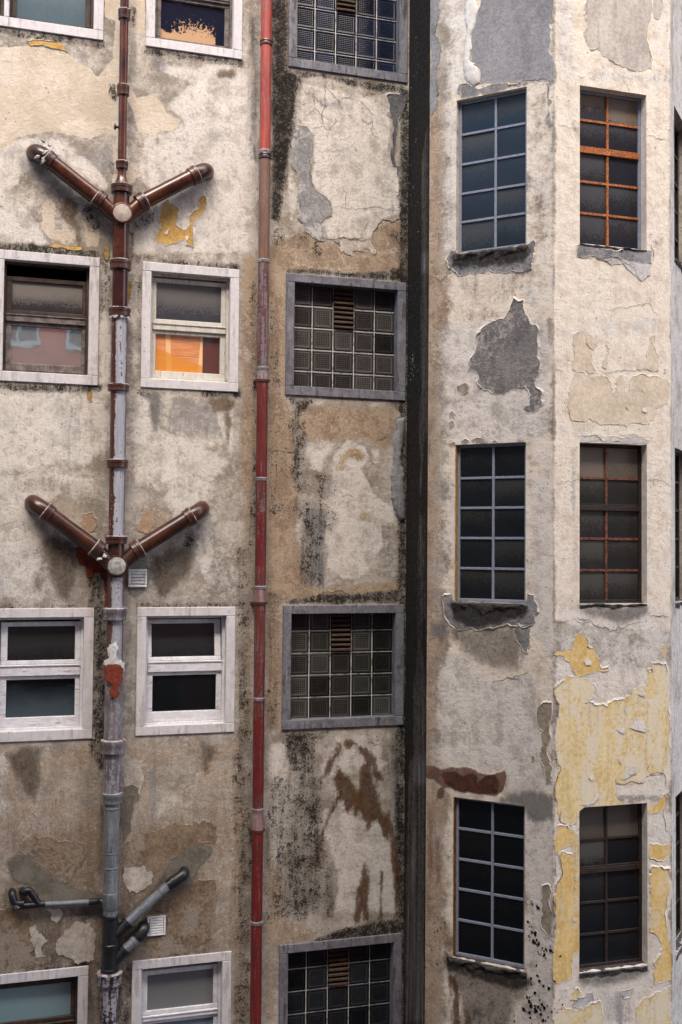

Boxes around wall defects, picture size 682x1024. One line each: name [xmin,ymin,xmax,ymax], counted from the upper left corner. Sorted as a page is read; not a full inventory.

spalling [457,0,554,127]
spalling [583,0,664,72]
peeling [155,194,209,249]
spalling [289,125,377,256]
spalling [457,296,545,414]
peeling [566,331,671,444]
spalling [442,593,540,654]
peeling [530,632,673,1024]
spalling [0,907,97,974]
damp [425,921,566,1024]